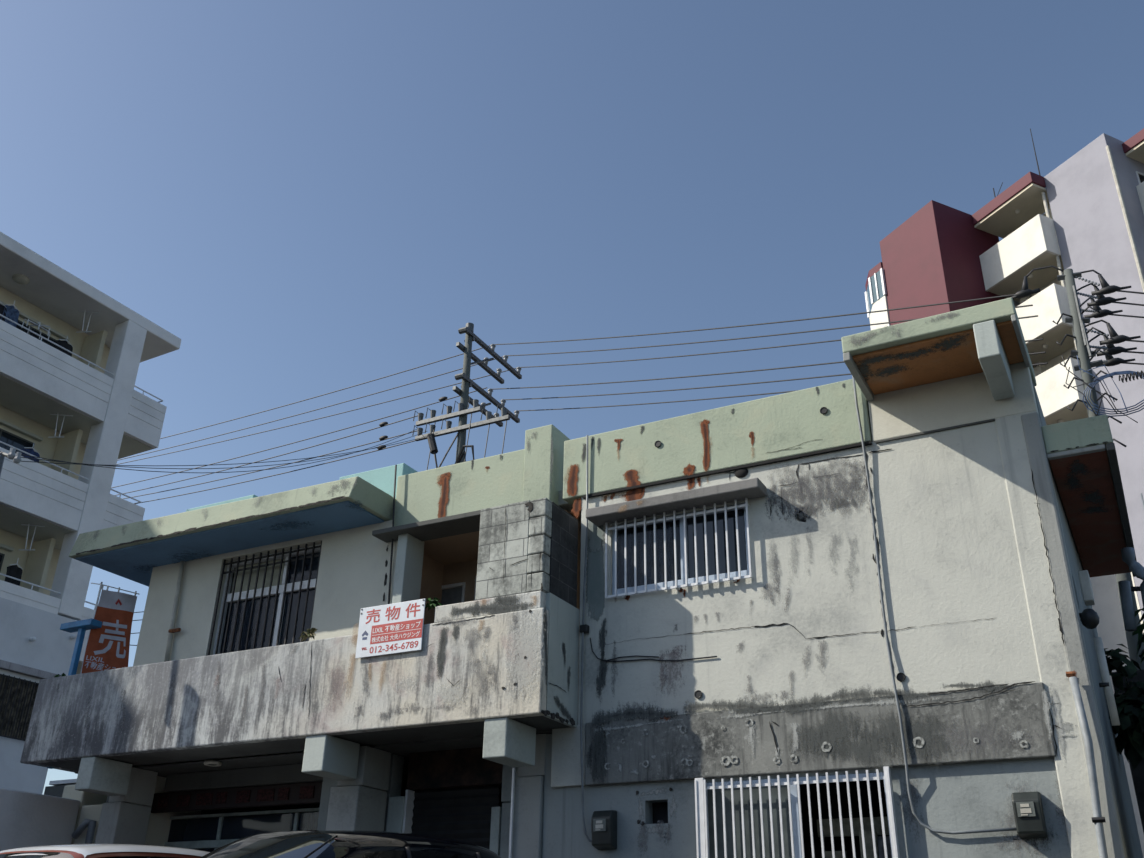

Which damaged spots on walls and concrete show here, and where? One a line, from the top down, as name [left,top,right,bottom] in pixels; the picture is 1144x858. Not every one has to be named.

water stain [855,333,969,381]
corrosion [438,472,451,518]
corrosion [567,464,582,518]
corrosion [603,469,645,502]
corrosion [683,419,710,490]
water stain [768,458,865,520]
water stain [586,520,616,695]
water stain [750,556,789,608]
crack [606,439,994,665]
water stain [425,593,571,721]
water stain [587,672,1012,782]